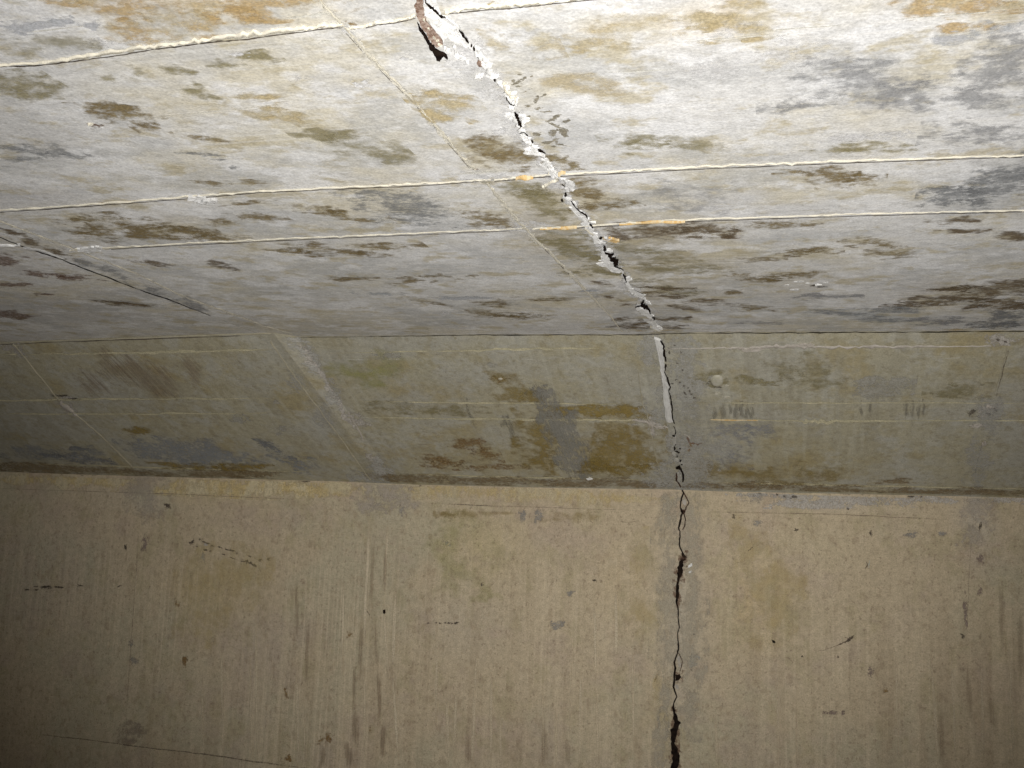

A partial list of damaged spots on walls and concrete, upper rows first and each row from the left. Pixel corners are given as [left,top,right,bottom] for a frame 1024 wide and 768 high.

spalling [414,0,482,67]
water stain [85,102,160,133]
water stain [240,94,356,148]
water stain [68,200,274,242]
water stain [403,29,774,329]
water stain [772,165,888,183]
water stain [915,167,1024,241]
water stain [266,242,428,258]
water stain [794,280,1024,329]
crack [431,329,526,337]
crack [474,45,1024,768]
water stain [0,383,669,507]